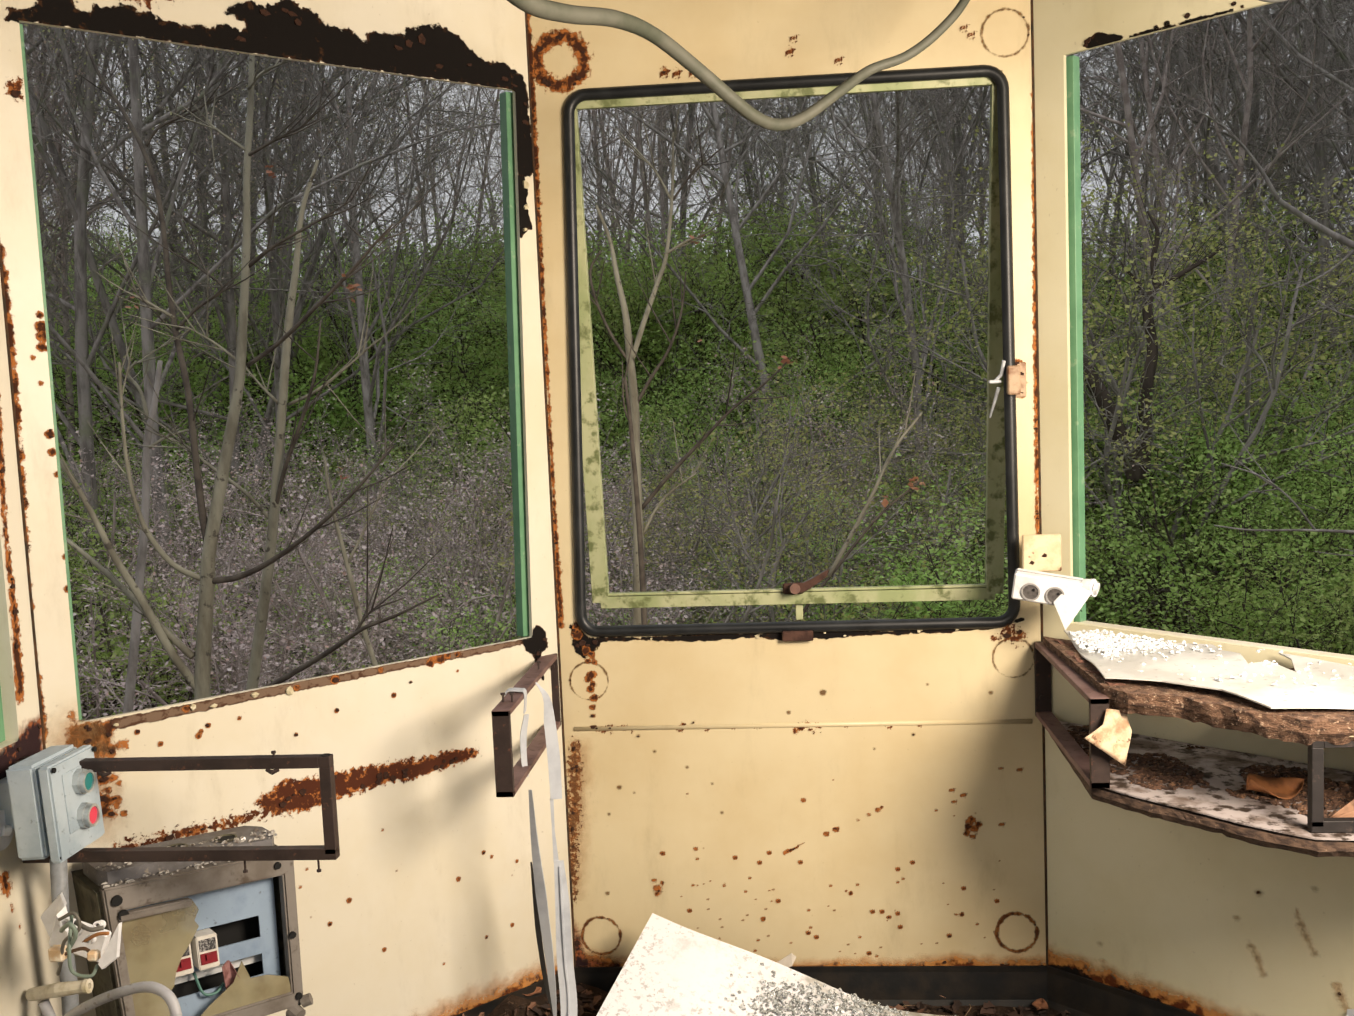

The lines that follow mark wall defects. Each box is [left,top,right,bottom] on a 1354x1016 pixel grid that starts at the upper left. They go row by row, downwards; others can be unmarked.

corrosion [1083,1,1244,48]
peeling [518,175,532,238]
corrosion [1015,93,1039,534]
corrosion [4,0,640,737]
corrosion [0,244,48,780]
corrosion [991,624,1034,678]
corrosion [65,711,140,819]
corrosion [113,747,479,848]
corrosion [567,735,585,907]
corrosion [438,966,558,1016]
corrosion [574,916,627,968]
corrosion [794,889,1230,1016]